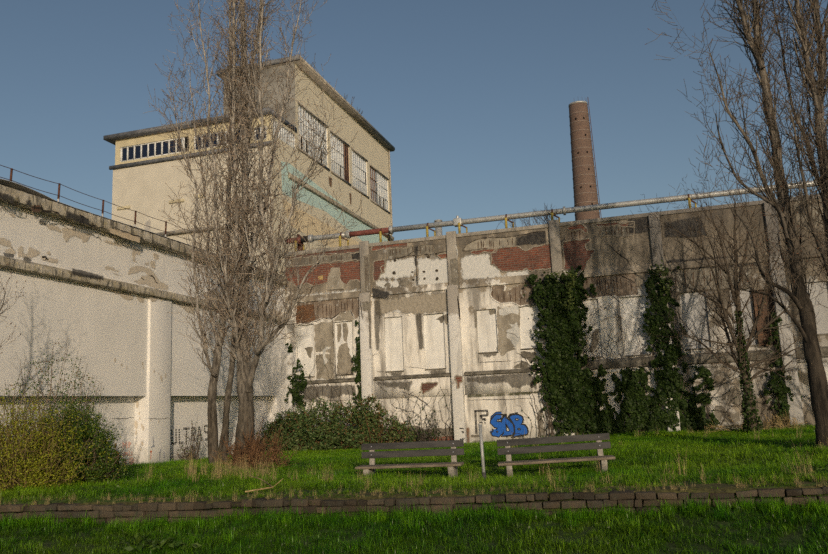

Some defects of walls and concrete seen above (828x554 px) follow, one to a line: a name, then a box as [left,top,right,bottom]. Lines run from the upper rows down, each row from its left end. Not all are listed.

flaking render [561,221,635,271]
peeling [78,249,168,302]
flaking render [284,235,552,384]